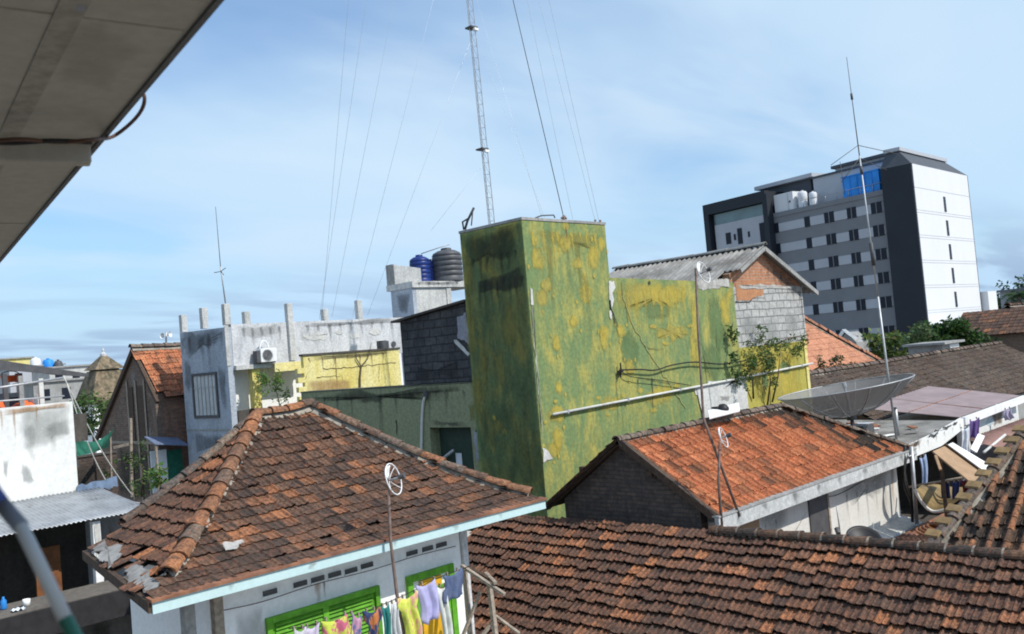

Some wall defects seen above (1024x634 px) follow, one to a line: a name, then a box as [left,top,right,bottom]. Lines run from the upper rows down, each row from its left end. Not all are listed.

peeling [596,278,765,416]
spalling [93,524,160,593]